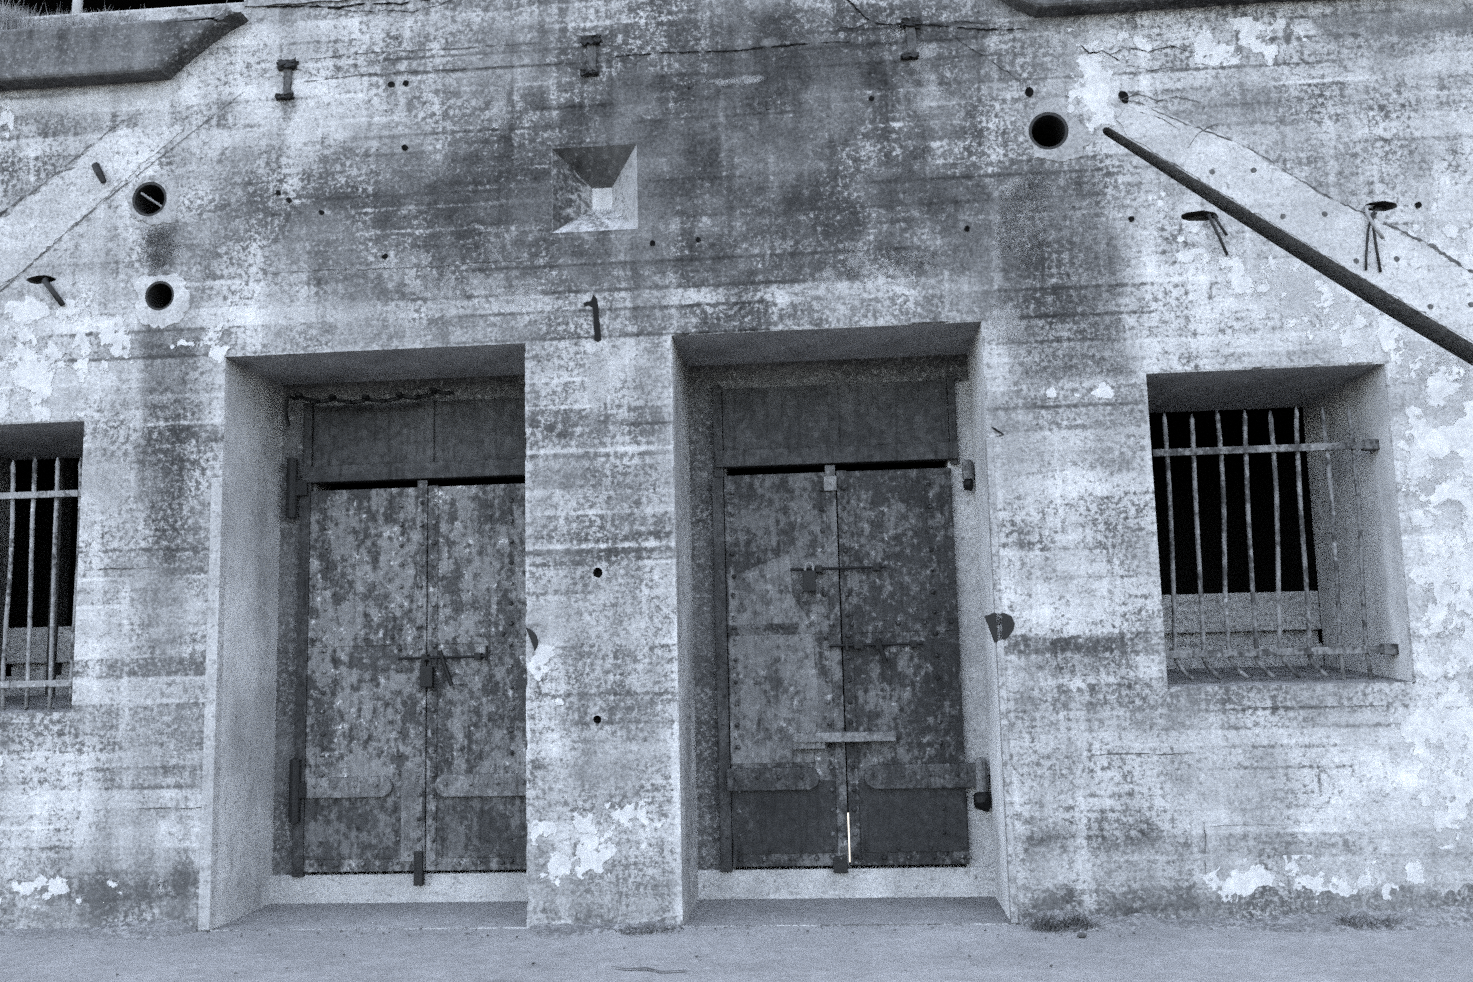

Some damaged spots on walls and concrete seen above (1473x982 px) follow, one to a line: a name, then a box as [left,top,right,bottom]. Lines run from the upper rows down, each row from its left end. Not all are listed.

crack [263,0,450,12]
crack [304,40,584,118]
crack [615,0,1028,81]
peeling [1052,23,1171,134]
peeling [1194,16,1309,66]
peeling [0,102,14,138]
peeling [1148,190,1166,208]
peeling [0,275,133,422]
peeling [1164,201,1473,849]
peeling [530,796,666,887]
peeling [0,874,81,909]
spalling [1176,855,1473,918]